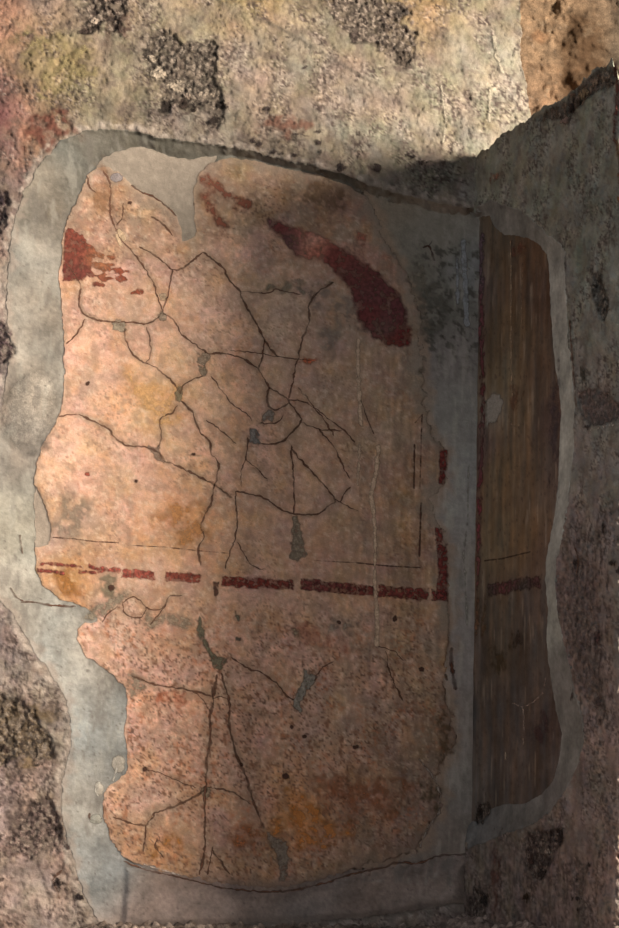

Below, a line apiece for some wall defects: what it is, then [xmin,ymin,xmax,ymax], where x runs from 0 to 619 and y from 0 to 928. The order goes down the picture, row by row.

spalling [539,67,618,124]
spalling [590,269,610,320]
crack [53,170,374,570]
crack [102,595,182,625]
crack [378,646,404,701]
spalling [0,693,54,767]
crack [88,657,465,893]
spalling [6,800,70,861]
spalling [525,826,563,880]